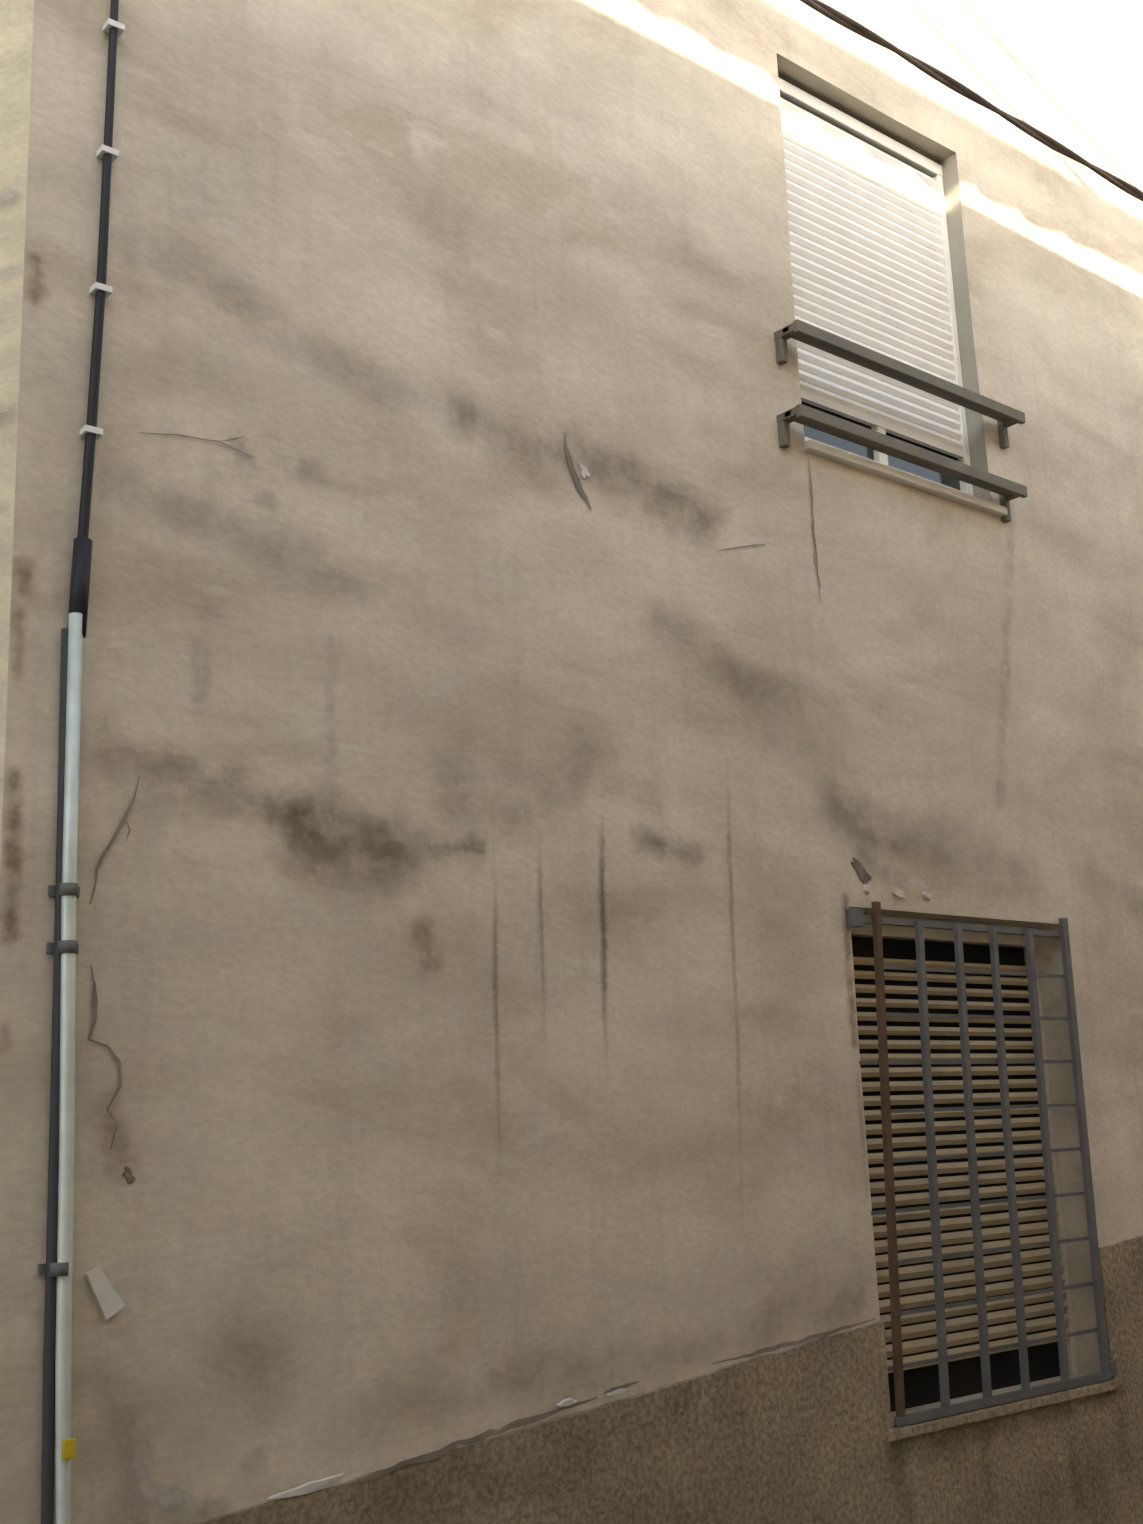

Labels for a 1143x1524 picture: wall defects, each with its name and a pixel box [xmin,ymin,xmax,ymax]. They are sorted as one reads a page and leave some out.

crack [138,432,255,459]
crack [88,964,122,1150]